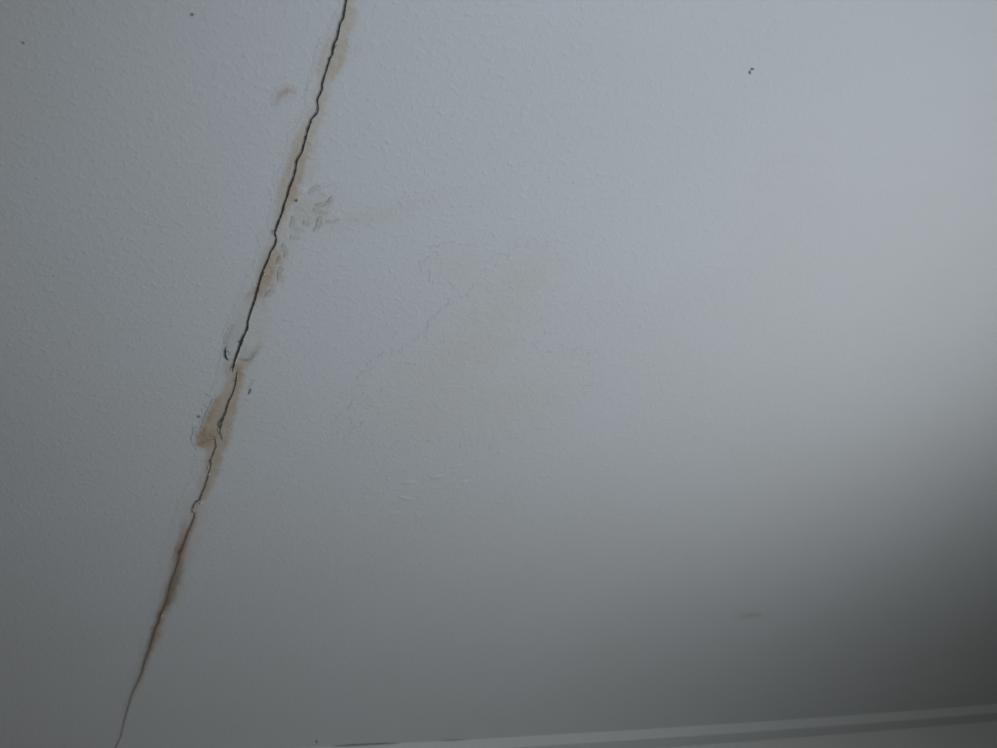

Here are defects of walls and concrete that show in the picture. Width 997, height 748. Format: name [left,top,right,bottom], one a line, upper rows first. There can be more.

crack [115,0,347,748]
water stain [117,0,366,742]